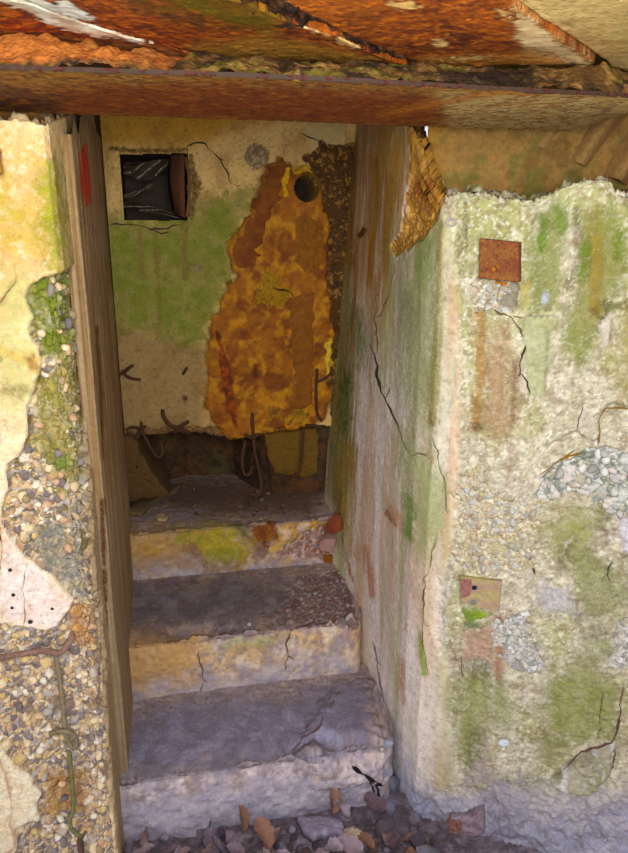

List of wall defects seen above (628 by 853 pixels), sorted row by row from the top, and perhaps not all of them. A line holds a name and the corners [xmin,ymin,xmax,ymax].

peeling [387,1,423,10]
peeling [497,6,592,65]
rust [204,157,336,440]
crack [370,267,448,513]
leakage [429,338,441,426]
crack [493,309,530,393]
leakage [600,316,611,346]
spalling [0,269,115,853]
crack [421,530,438,674]
spalling [449,445,628,577]
leakage [620,519,628,552]
crack [553,685,624,777]